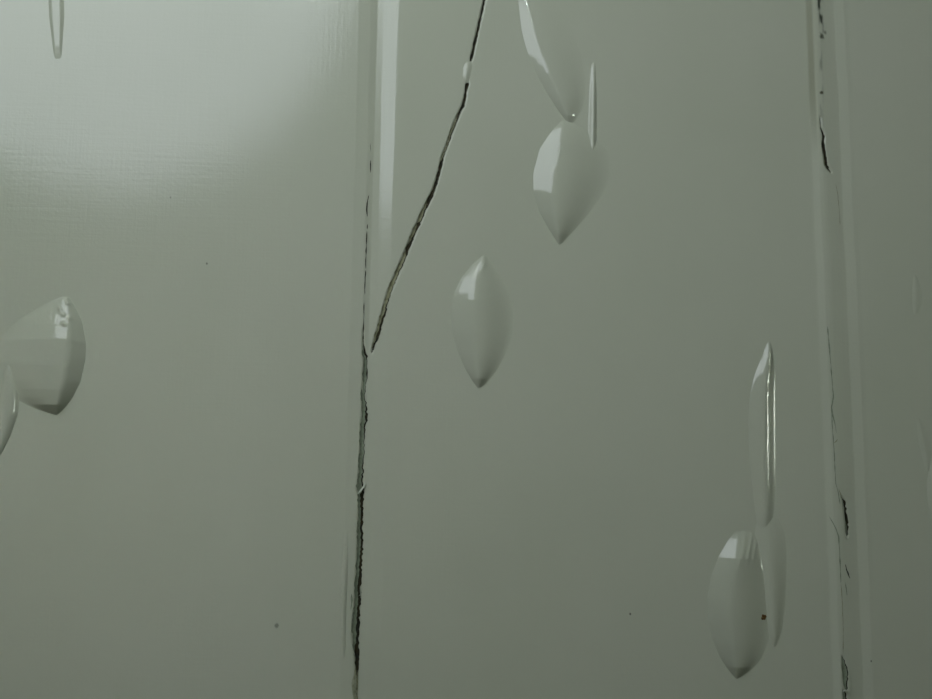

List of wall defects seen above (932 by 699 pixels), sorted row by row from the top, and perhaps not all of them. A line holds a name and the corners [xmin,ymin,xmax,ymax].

crack [470,0,485,61]
crack [820,122,840,214]
crack [351,83,469,699]
crack [827,326,850,699]